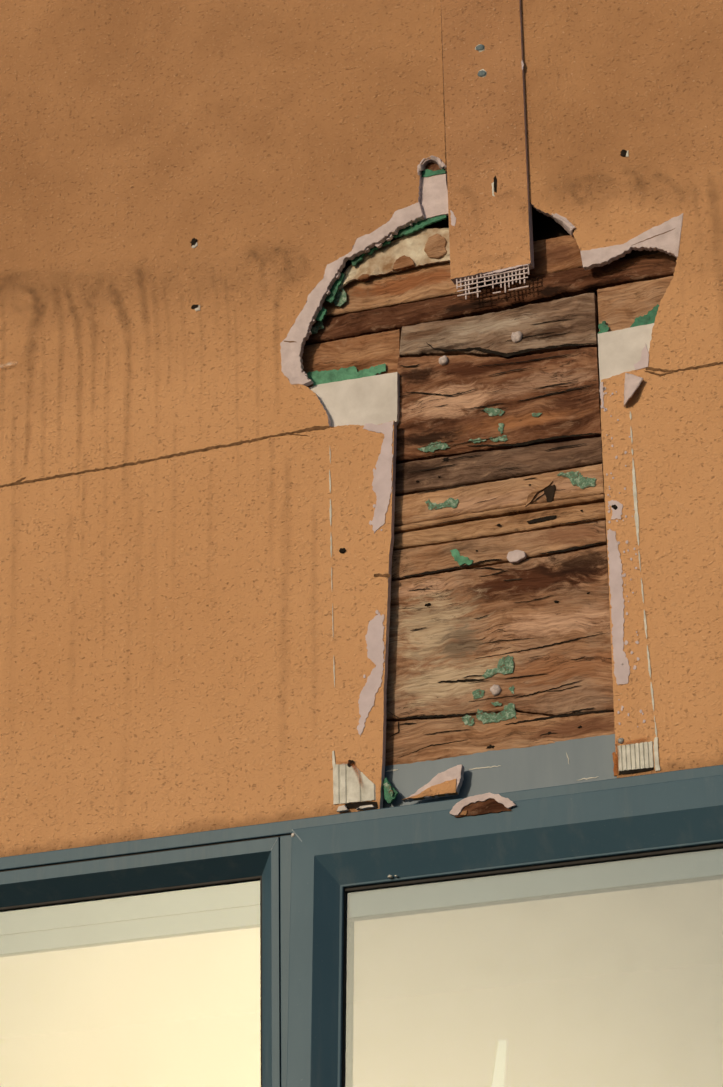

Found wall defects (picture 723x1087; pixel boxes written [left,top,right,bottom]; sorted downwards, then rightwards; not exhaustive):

spalling [280,155,456,386]
spalling [551,213,576,236]
spalling [580,213,683,270]
peeling [630,304,659,327]
spalling [599,344,649,421]
crack [645,362,723,376]
crack [0,426,332,487]
peeling [363,421,394,533]
peeling [557,471,640,685]
peeling [357,610,385,736]
spalling [332,751,378,812]
spalling [617,737,660,775]